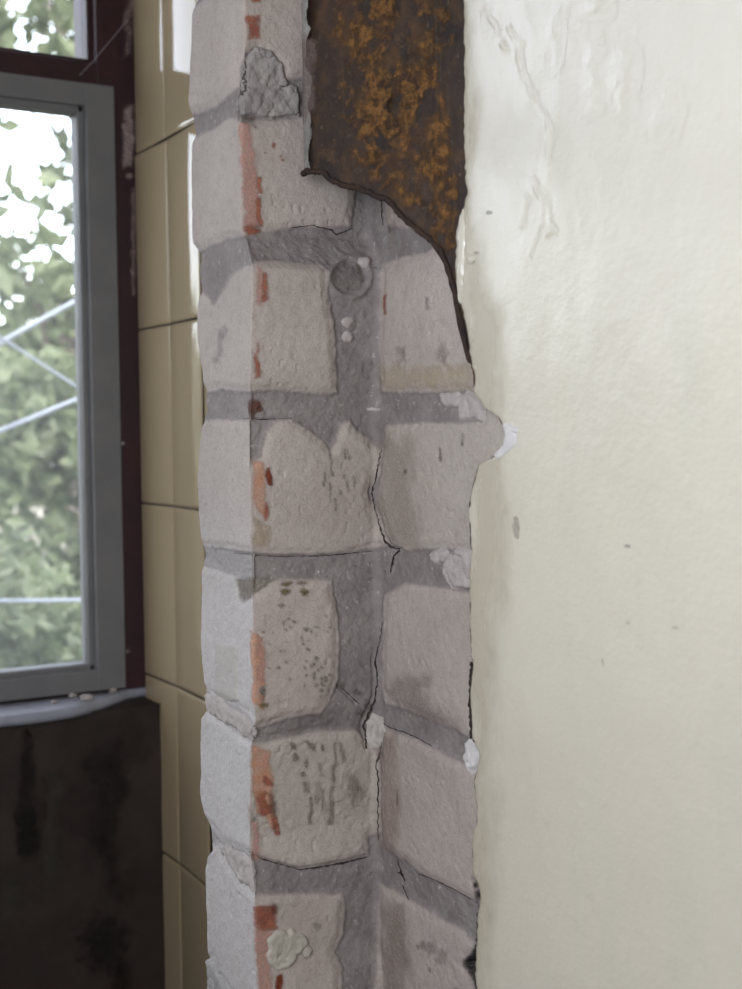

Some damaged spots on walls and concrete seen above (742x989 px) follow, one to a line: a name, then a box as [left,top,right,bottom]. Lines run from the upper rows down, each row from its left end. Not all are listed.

peeling [301,0,312,169]
rust [336,0,458,247]
spalling [237,577,270,599]
flaking render [366,195,519,989]
spalling [204,691,257,740]
spalling [219,843,257,892]
spalling [205,958,230,989]